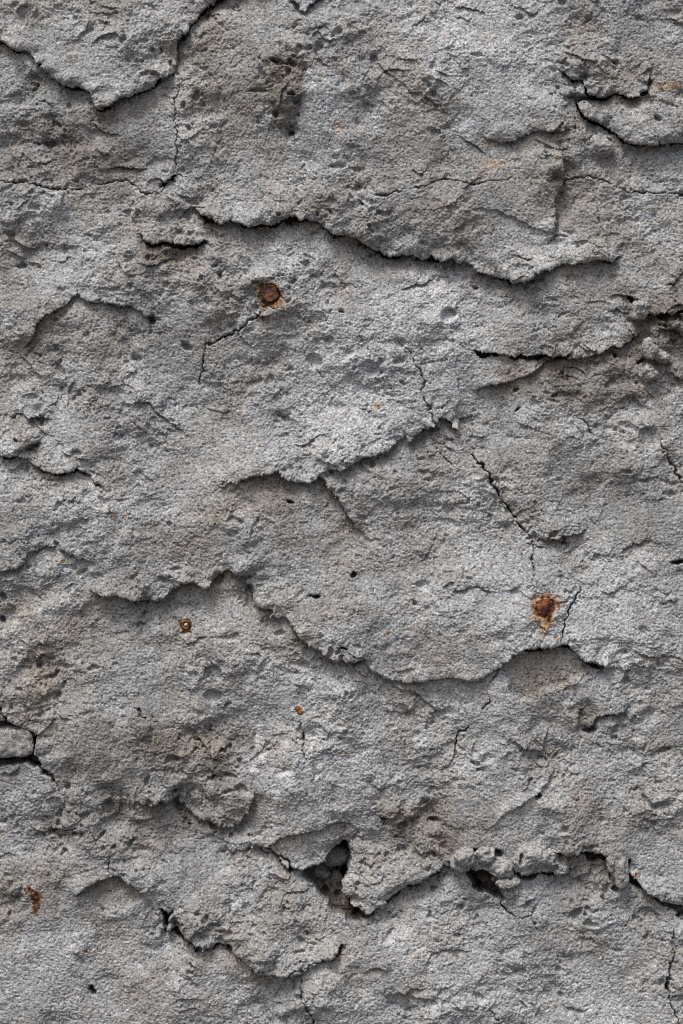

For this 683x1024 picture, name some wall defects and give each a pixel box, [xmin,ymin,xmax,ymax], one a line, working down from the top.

crack [9,94,191,196]
crack [374,177,512,196]
crack [560,176,683,197]
corrosion [255,280,286,310]
crack [200,304,281,385]
corrosion [179,616,196,636]
corrosion [527,589,563,645]
crack [561,588,581,645]
crack [0,707,55,783]
spalling [94,779,505,922]
corrosion [24,885,44,917]
flaking render [513,842,683,917]